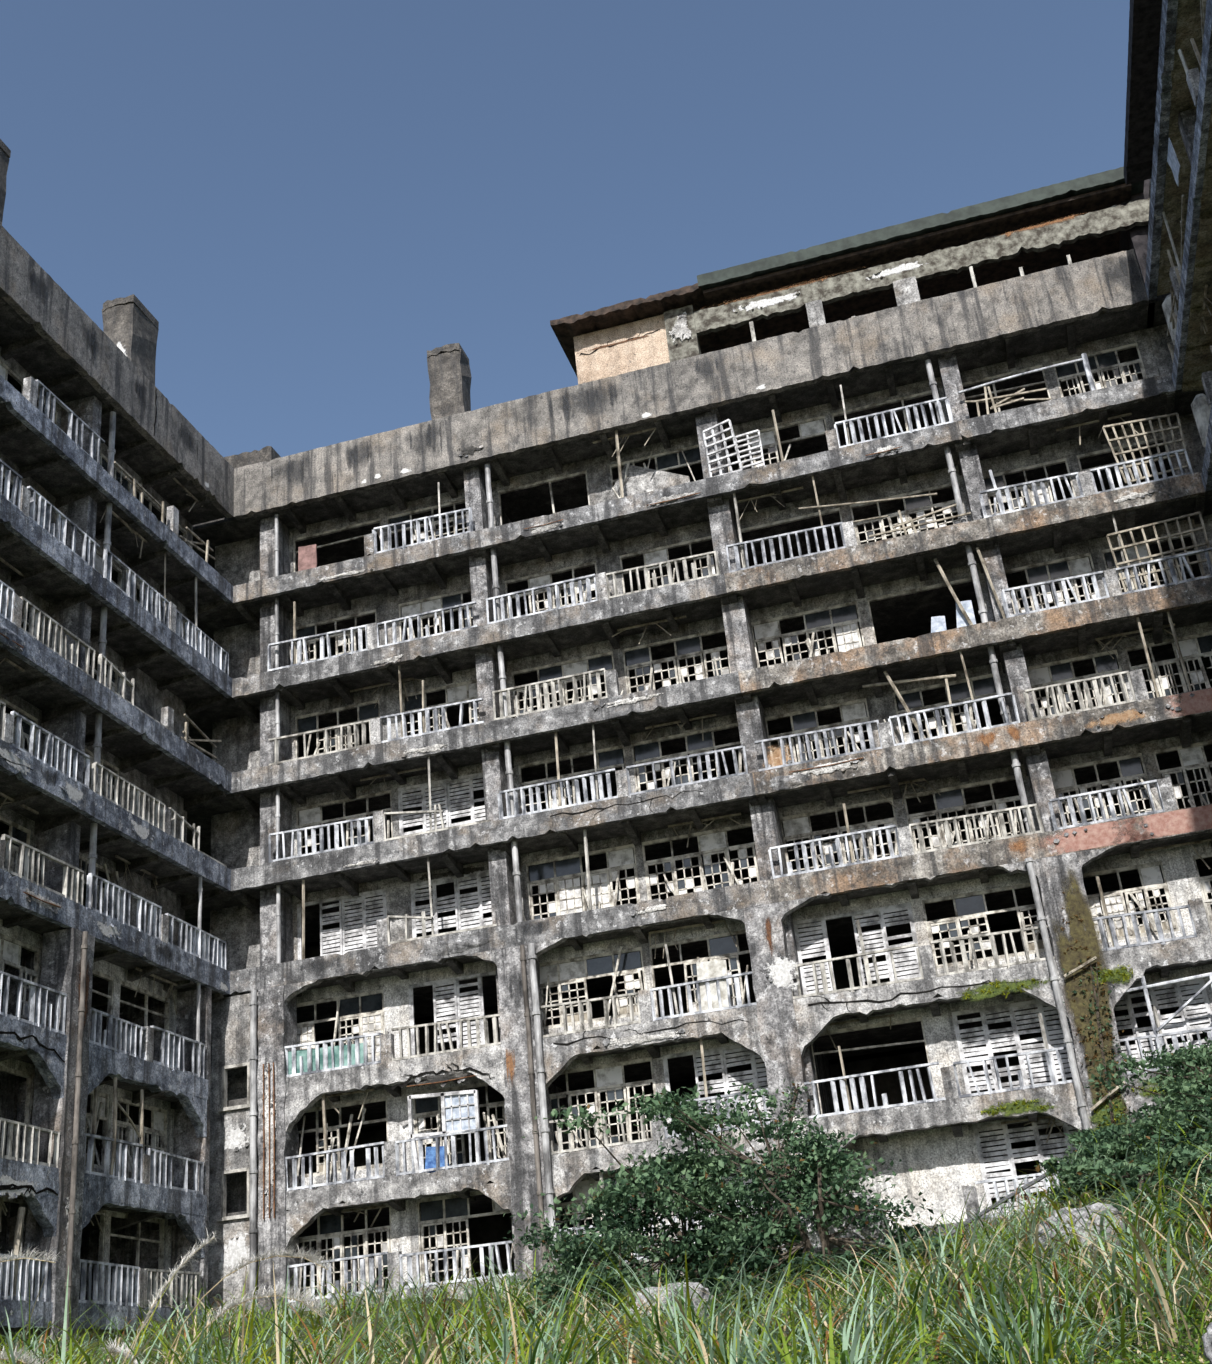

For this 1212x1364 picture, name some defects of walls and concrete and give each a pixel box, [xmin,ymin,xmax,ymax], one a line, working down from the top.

leakage [1105,255,1147,297]
leakage [84,328,96,358]
leakage [696,361,718,378]
leakage [550,388,616,419]
leakage [410,428,442,453]
leakage [347,445,369,465]
leakage [271,462,303,480]
crack [0,1031,65,1063]
peeling [0,1175,38,1199]